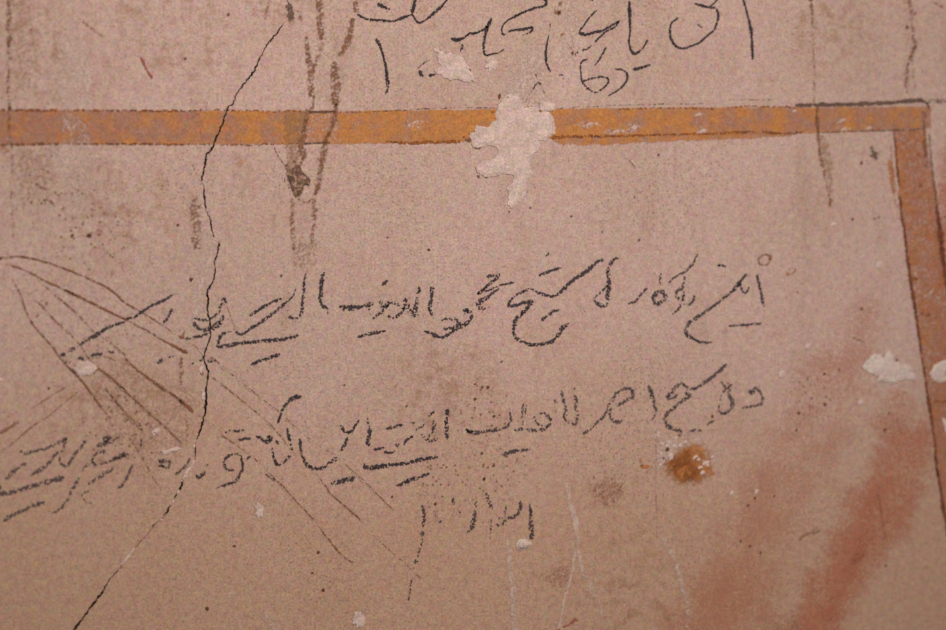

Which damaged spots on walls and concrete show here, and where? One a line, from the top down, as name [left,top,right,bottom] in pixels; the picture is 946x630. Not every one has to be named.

damp [285,1,358,250]
flaking render [434,48,475,82]
flaking render [463,48,556,212]
crack [73,0,301,630]
flaking render [862,351,946,383]
rust [640,427,722,485]